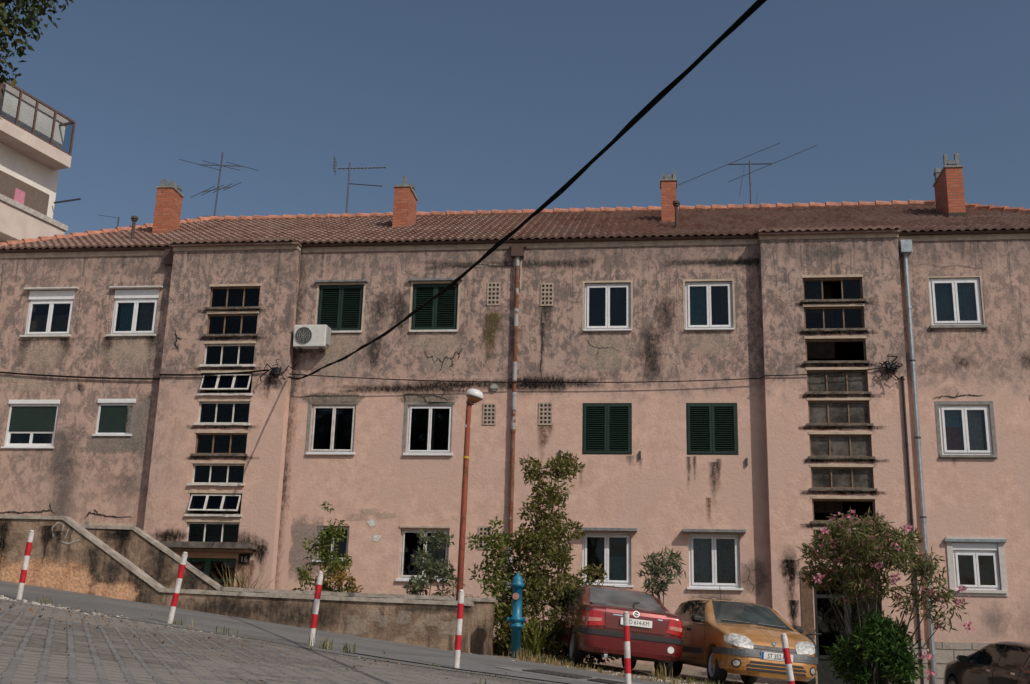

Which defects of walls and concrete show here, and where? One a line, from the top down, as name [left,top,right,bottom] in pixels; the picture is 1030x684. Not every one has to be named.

crack [932,392,985,400]
crack [87,509,131,518]
crack [0,504,55,569]
water stain [107,529,129,548]
water stain [87,548,118,586]
water stain [129,531,183,602]
water stain [185,567,204,590]